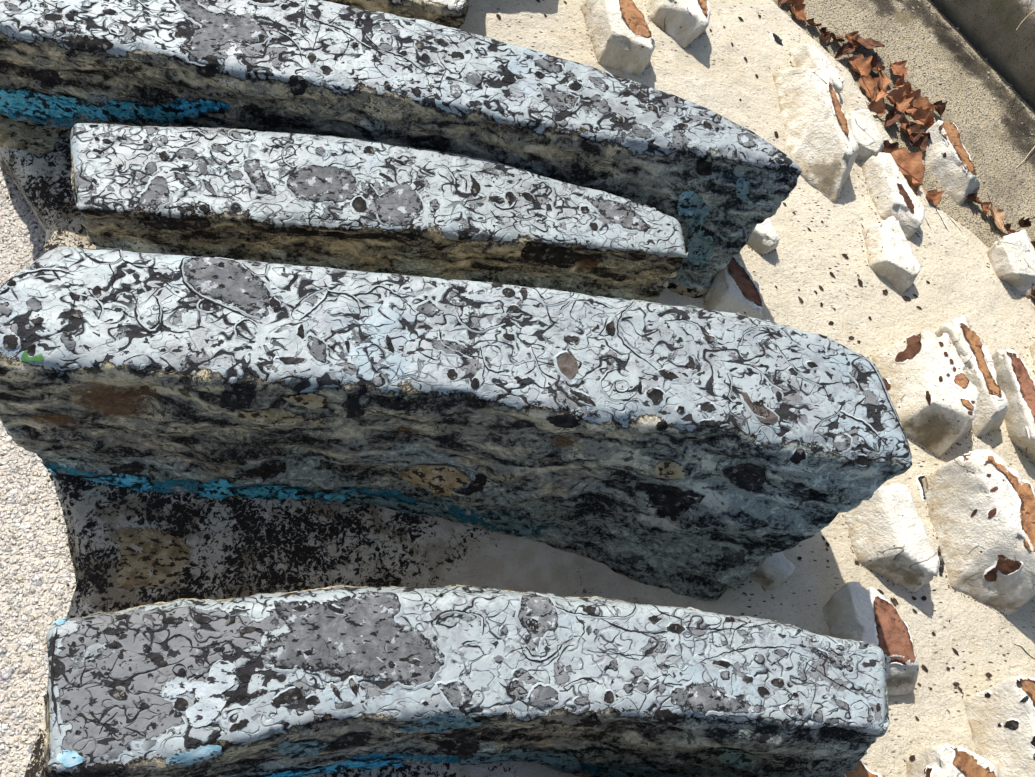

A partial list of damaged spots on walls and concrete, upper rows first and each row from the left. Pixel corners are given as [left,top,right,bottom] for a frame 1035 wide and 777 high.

crack [0,247,257,341]
crack [291,277,416,321]
crack [528,287,708,402]
crack [727,325,909,447]
peeling [964,449,1035,552]
peeling [982,555,1024,582]
crack [50,629,60,727]
peeling [499,592,559,652]
peeling [491,655,852,727]
crack [520,603,856,704]
peeling [793,589,932,690]
peeling [1016,677,1035,710]